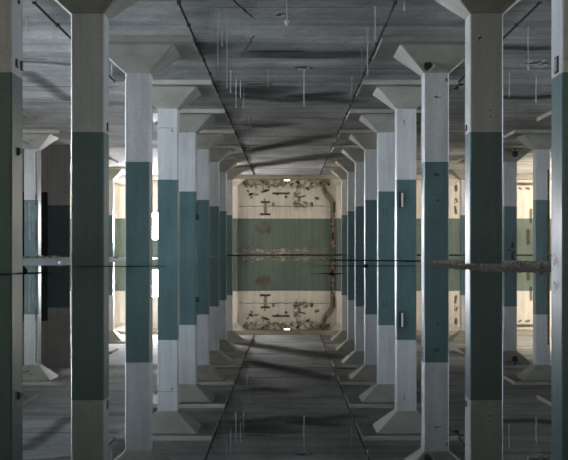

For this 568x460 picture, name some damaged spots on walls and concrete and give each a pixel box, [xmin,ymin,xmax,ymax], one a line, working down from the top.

water stain [231,84,360,102]
peeling [243,180,330,192]